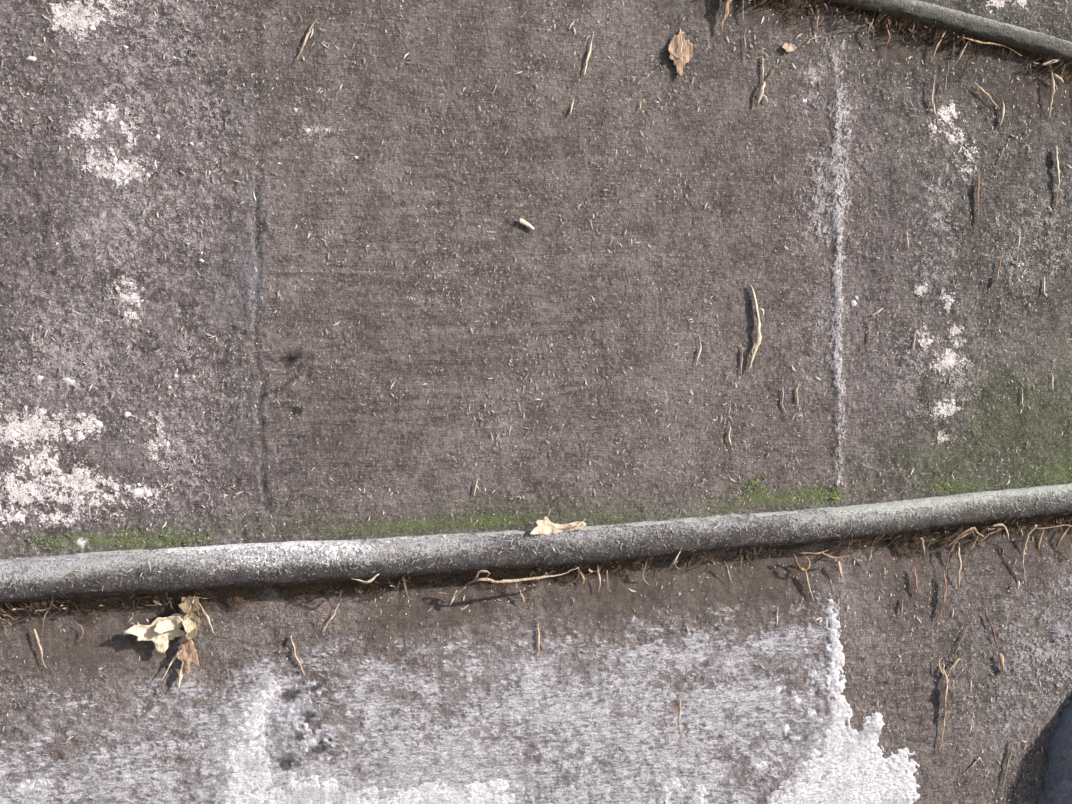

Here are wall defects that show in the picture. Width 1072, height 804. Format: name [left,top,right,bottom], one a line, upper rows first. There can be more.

water stain [0,0,267,533]
water stain [293,92,372,169]
water stain [784,40,876,483]
water stain [887,100,988,444]
water stain [75,529,563,575]